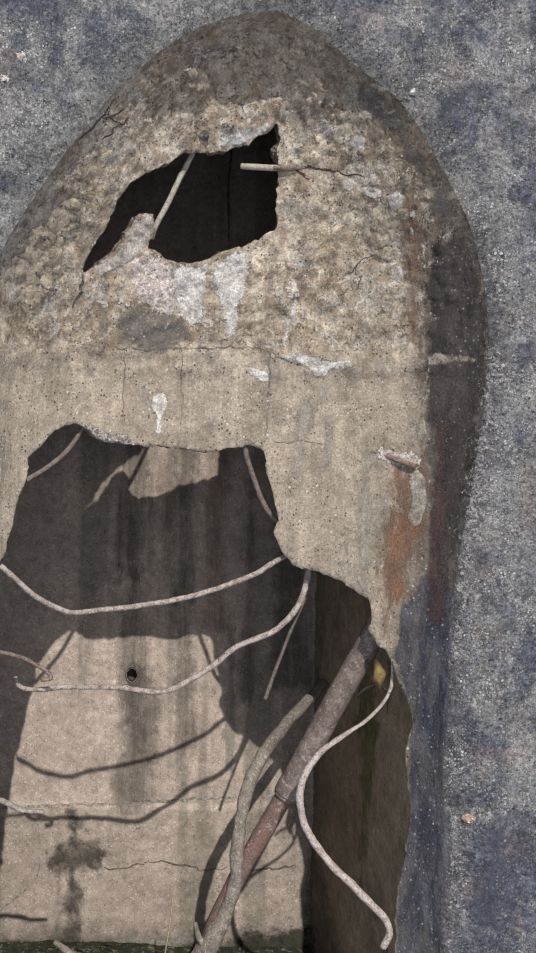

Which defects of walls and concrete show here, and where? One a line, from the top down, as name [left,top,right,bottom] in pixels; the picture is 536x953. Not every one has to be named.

crack [77,99,129,142]
spalling [95,216,154,274]
peeling [246,368,270,382]
spalling [85,423,136,445]
peeling [377,446,427,527]
corrosion [376,468,426,610]
water stain [386,235,487,953]
water stain [275,605,311,688]
water stain [353,665,380,869]
water stain [48,810,105,942]
crack [104,860,227,871]
crack [251,864,296,872]